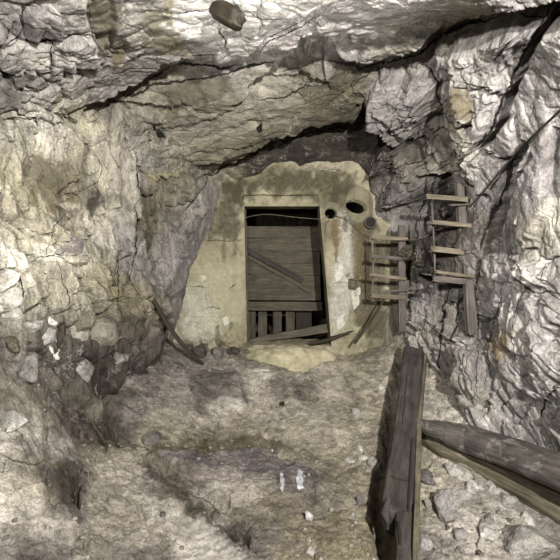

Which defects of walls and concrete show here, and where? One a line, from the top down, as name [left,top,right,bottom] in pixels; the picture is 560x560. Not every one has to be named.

water stain [210,161,388,336]
peeling [329,210,366,334]